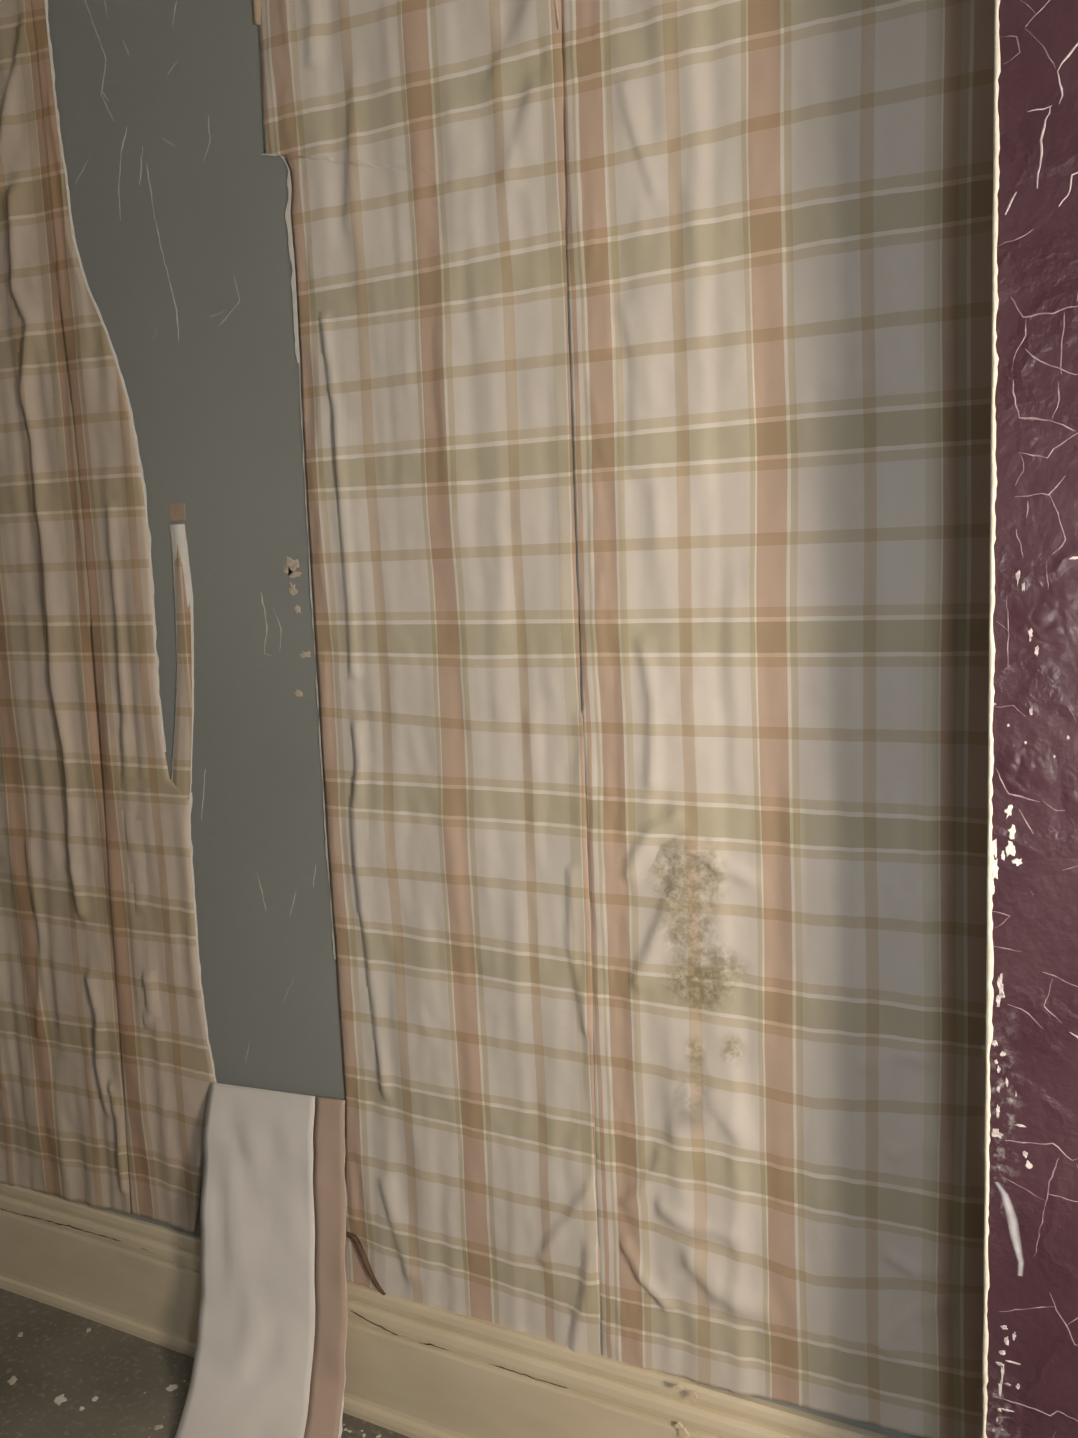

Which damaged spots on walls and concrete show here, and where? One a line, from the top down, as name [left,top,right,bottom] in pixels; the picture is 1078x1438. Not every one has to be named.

crack [999,0,1078,246]
crack [1011,294,1078,586]
peeling [283,557,301,614]
crack [999,599,1014,660]
crack [996,769,1065,833]
leakage [681,958,734,1000]
crack [992,911,1078,1038]
crack [1005,1140,1078,1256]
crack [999,1294,1078,1346]
crack [993,1396,1077,1437]